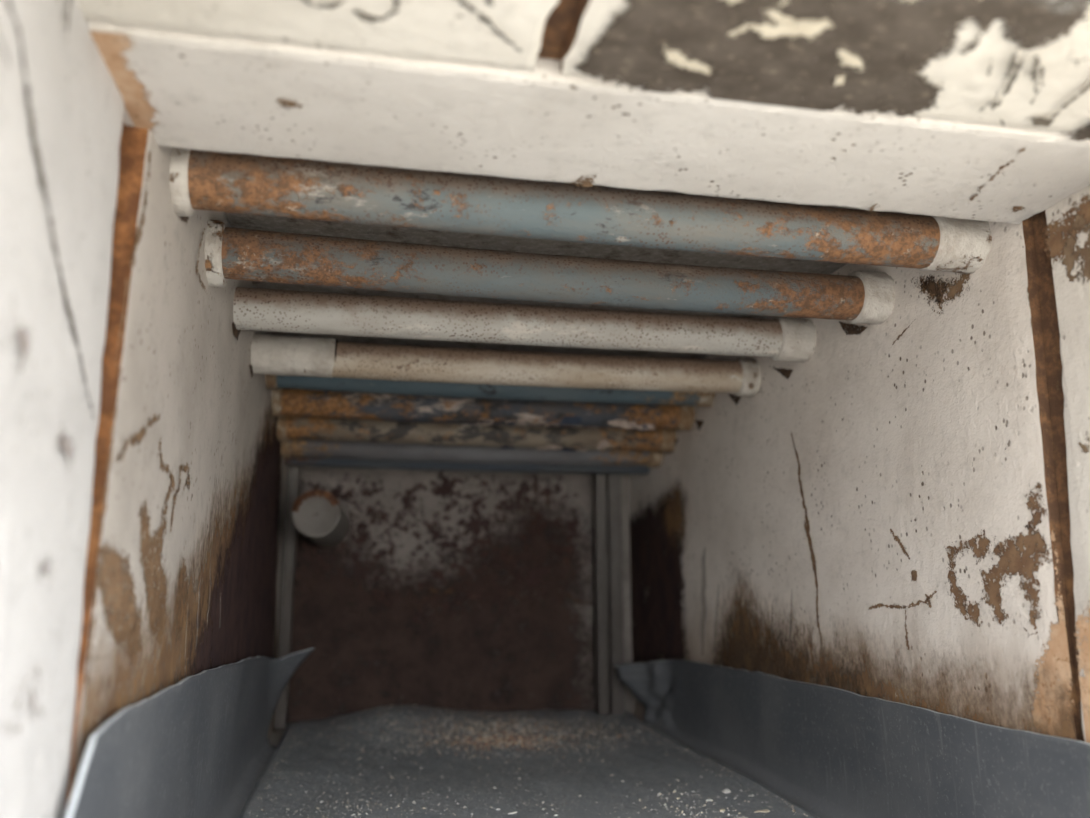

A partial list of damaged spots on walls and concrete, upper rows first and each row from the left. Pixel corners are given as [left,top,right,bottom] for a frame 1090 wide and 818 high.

corrosion [90,31,159,134]
spalling [573,0,1090,126]
crack [7,0,94,418]
spalling [1062,214,1090,282]
corrosion [775,368,793,379]
leakage [81,412,282,756]
leakage [287,501,595,723]
crack [791,431,822,642]
leakage [713,578,1077,740]
crack [868,529,937,650]
spalling [944,482,1051,635]
corrosion [1030,531,1090,743]